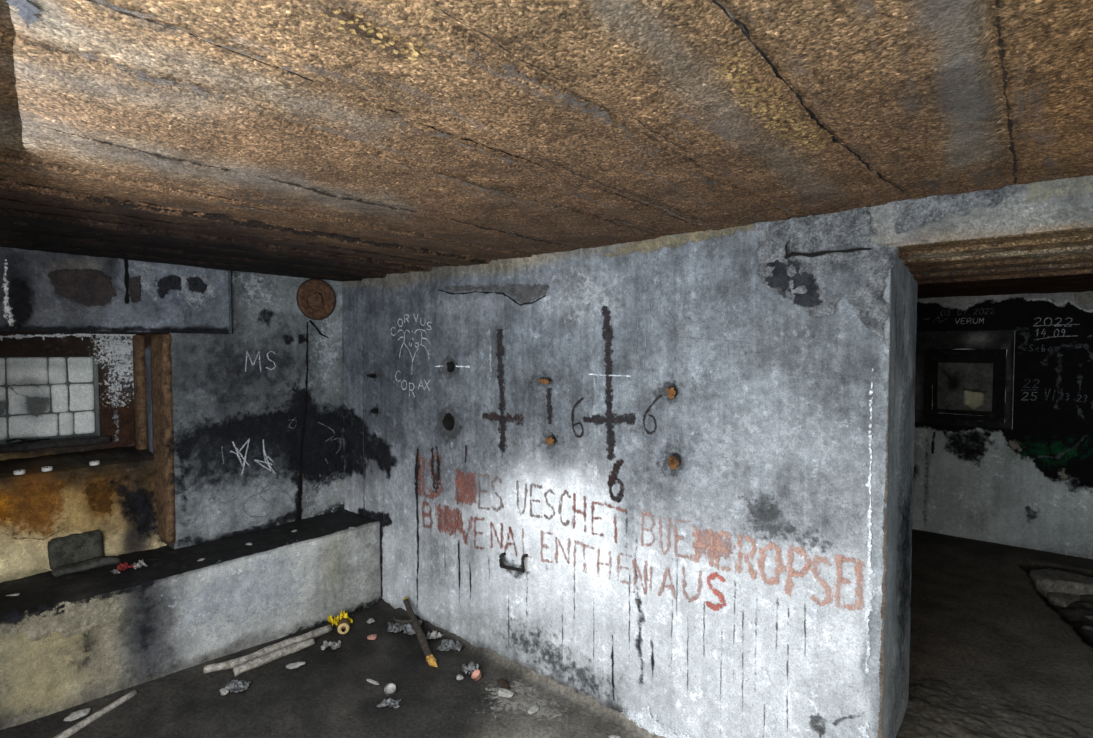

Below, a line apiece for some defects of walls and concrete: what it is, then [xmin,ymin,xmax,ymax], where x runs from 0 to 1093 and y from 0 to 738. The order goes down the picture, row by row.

crack [440,9,565,83]
crack [634,118,688,153]
crack [712,0,904,192]
crack [995,0,1018,184]
spalling [754,184,1024,342]
water stain [0,259,135,441]
rust [0,480,66,536]
rust [83,478,116,517]